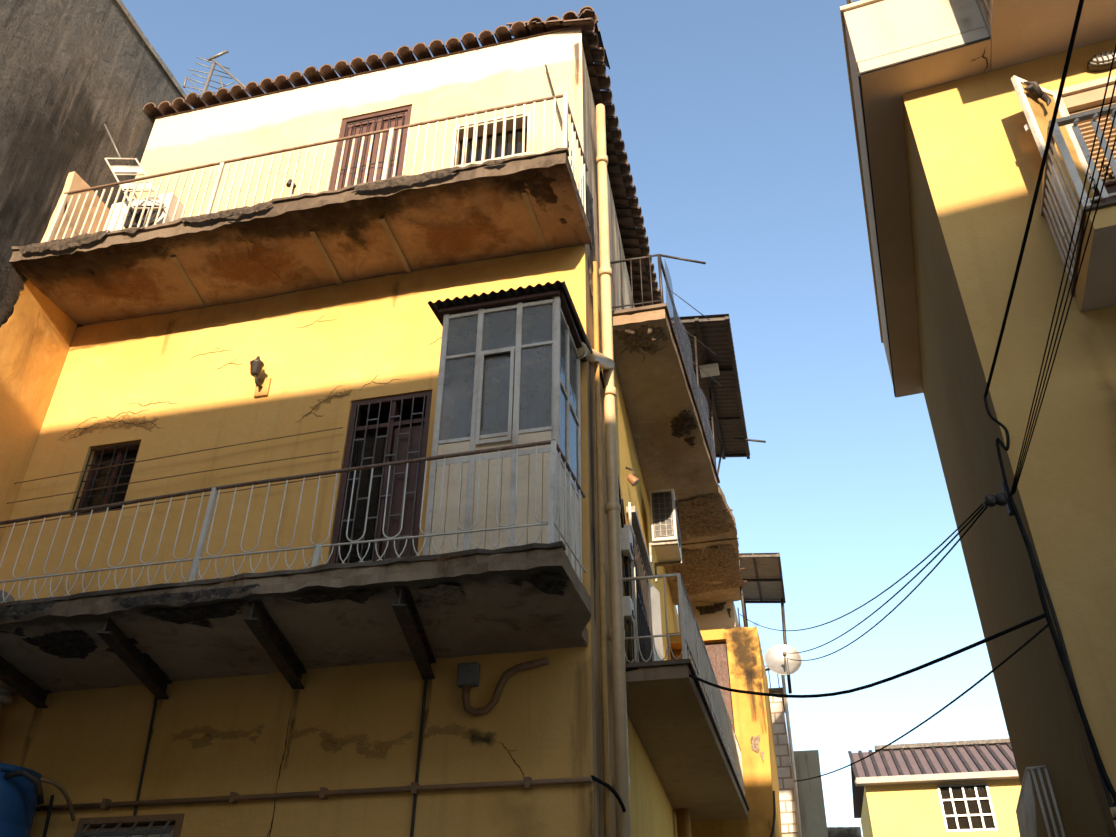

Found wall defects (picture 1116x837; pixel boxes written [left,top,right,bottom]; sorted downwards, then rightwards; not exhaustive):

damp [0,19,110,245]
damp [231,198,403,249]
damp [18,244,168,289]
spalling [613,324,668,356]
crack [56,401,176,442]
crack [294,374,406,423]
spalling [670,410,697,448]
spalling [672,495,745,618]
spalling [0,601,114,659]
spalling [143,602,244,628]
damp [730,626,764,717]
crack [267,693,295,837]